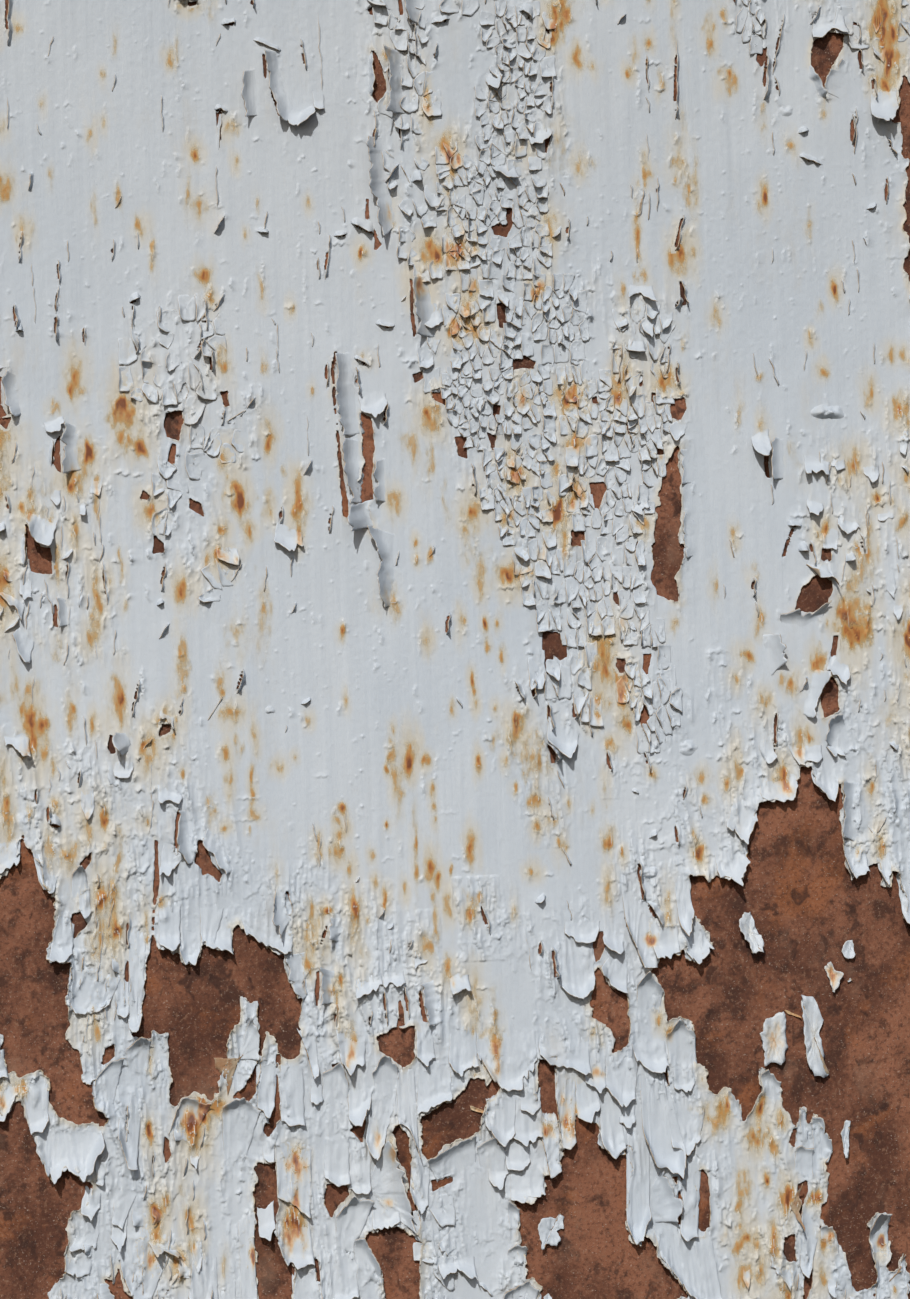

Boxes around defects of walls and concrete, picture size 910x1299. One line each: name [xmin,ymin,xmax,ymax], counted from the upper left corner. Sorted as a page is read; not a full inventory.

crack [647,41,680,120]
rust [637,446,685,602]
peeling [715,655,910,924]
rust [132,921,302,1149]
peeling [0,838,722,1299]
rust [590,931,630,1053]
peeling [739,912,764,953]
peeling [760,1012,788,1102]
rust [651,730,910,1299]
peeling [801,995,830,1078]
rust [249,1151,307,1299]
rust [514,1098,689,1299]